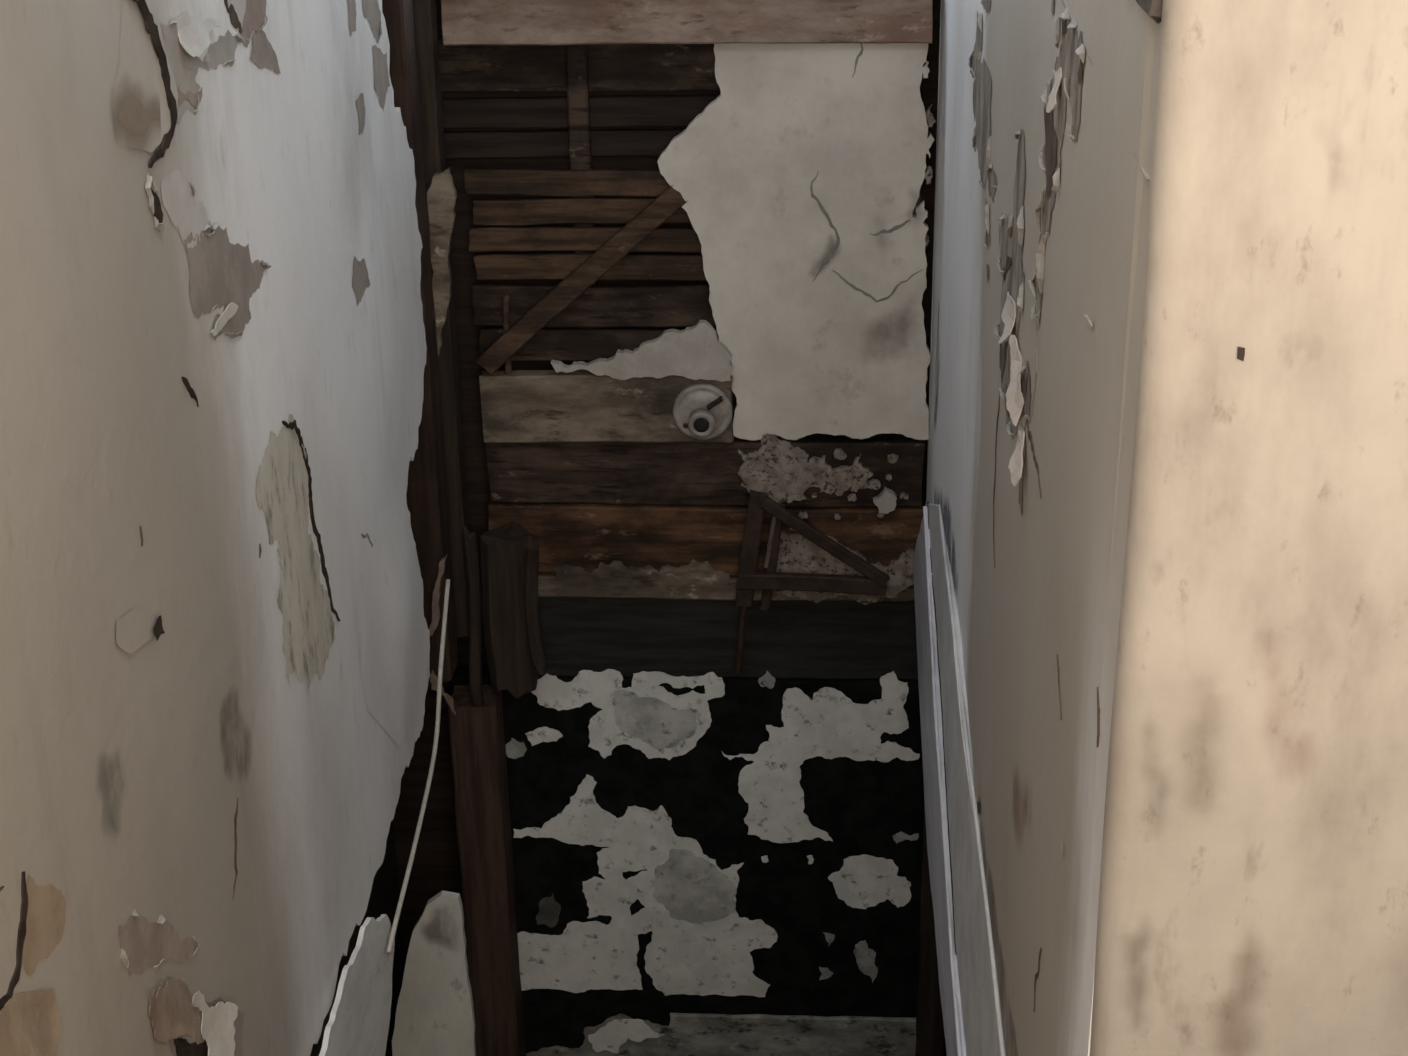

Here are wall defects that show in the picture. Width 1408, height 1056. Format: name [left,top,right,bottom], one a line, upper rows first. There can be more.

peeling [161,0,281,124]
peeling [161,169,271,340]
crack [810,172,922,302]
peeling [969,0,1085,514]
peeling [255,414,340,694]
flaking render [737,433,914,605]
peeling [505,727,563,759]
peeling [532,669,725,760]
peeling [722,670,920,864]
peeling [0,875,66,1056]
peeling [513,774,778,1054]
peeling [828,831,919,909]